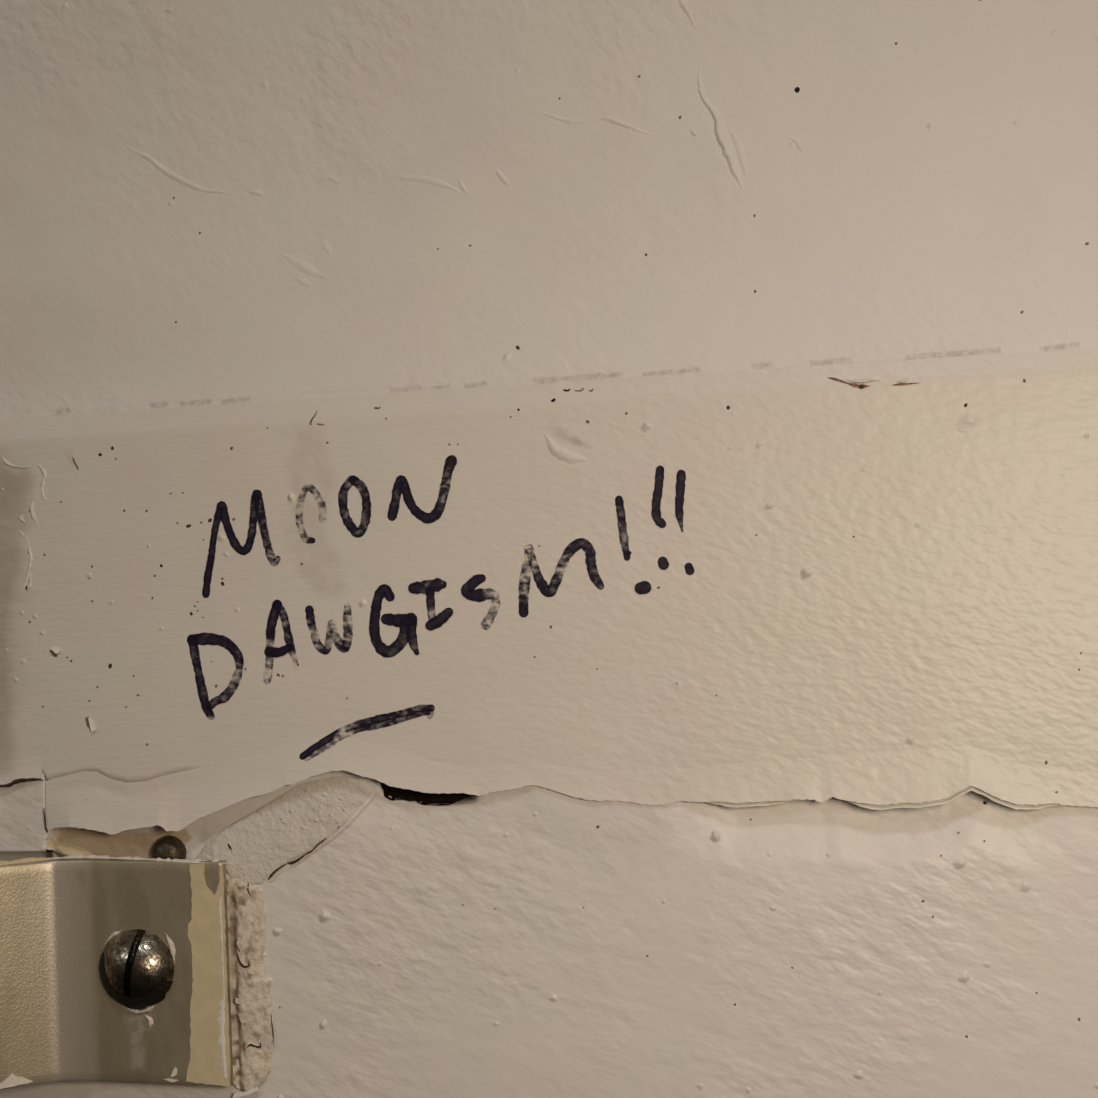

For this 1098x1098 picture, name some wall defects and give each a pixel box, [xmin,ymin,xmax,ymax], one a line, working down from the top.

peeling [0,735,1098,1098]